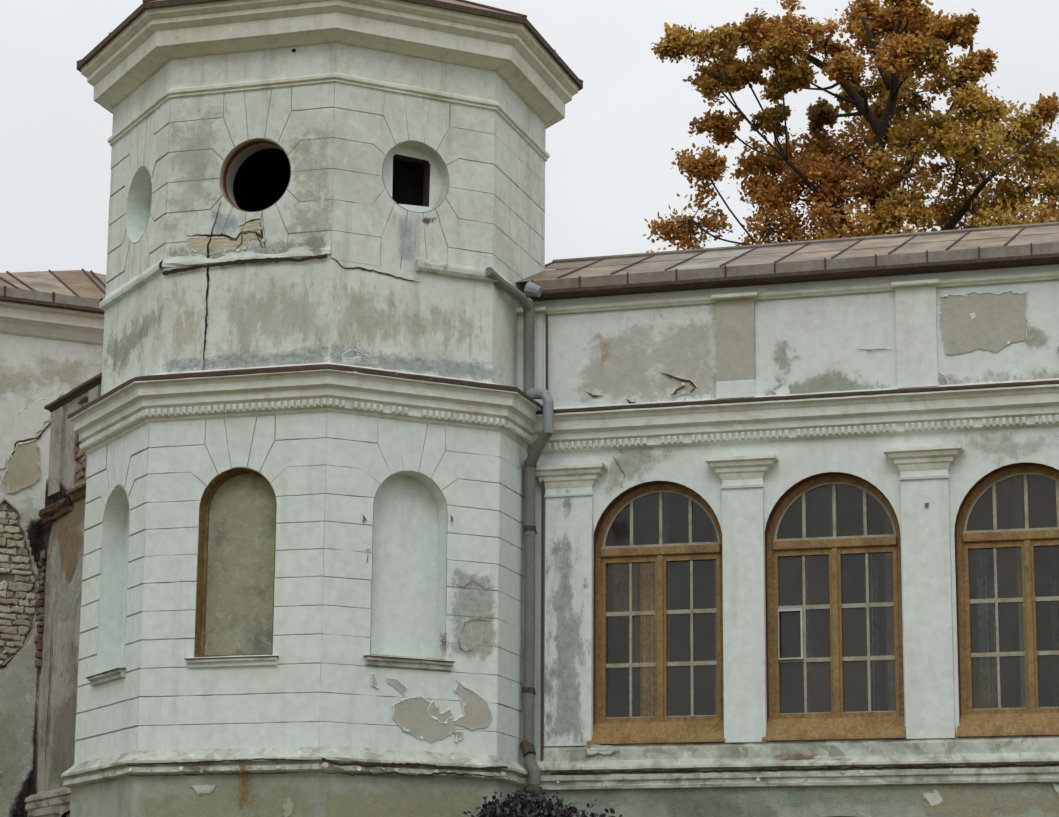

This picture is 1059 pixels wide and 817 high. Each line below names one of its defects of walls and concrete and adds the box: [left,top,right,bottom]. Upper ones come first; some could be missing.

spalling [187,217,265,256]
crack [187,202,266,370]
crack [331,257,417,282]
peeling [939,290,1029,355]
crack [660,372,696,395]
flaking render [75,434,87,484]
flaking render [0,439,47,675]
damp [544,537,591,742]
peeling [370,673,493,743]